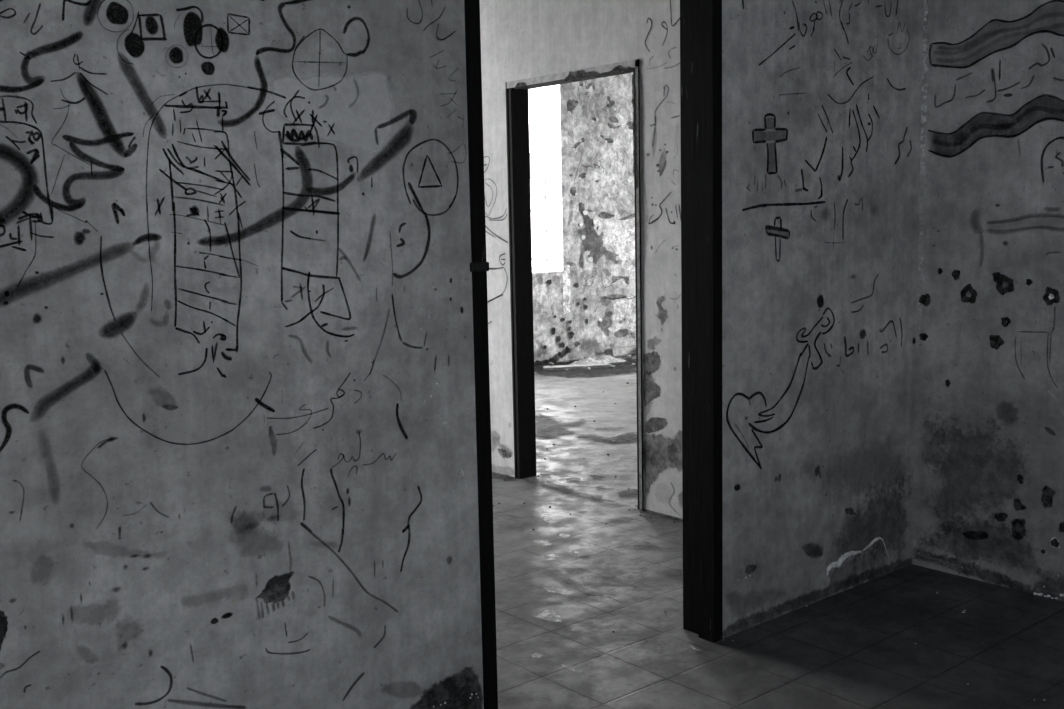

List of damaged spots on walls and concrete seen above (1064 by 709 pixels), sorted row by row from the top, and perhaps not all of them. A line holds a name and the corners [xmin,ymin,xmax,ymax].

damp [598,262,635,338]
damp [534,342,636,377]
peeling [643,351,661,406]
peeling [645,417,667,433]